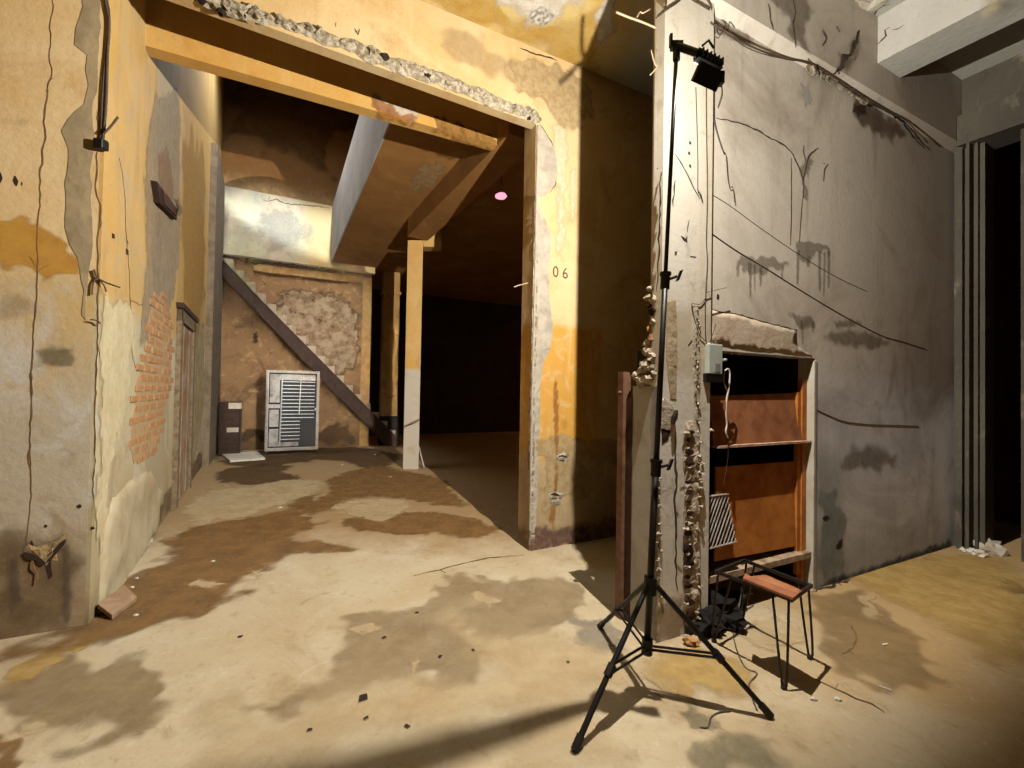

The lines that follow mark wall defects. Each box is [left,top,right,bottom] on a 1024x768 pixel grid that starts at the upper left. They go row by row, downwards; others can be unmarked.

crack [26,0,54,544]
peeling [0,0,101,320]
peeling [90,89,205,550]
water stain [0,423,501,768]
spalling [197,0,594,545]
water stain [211,575,749,759]
spalling [631,285,812,637]
crack [712,309,796,330]
crack [717,118,828,244]
crack [768,4,796,48]
crack [822,4,902,74]
crack [865,104,925,149]